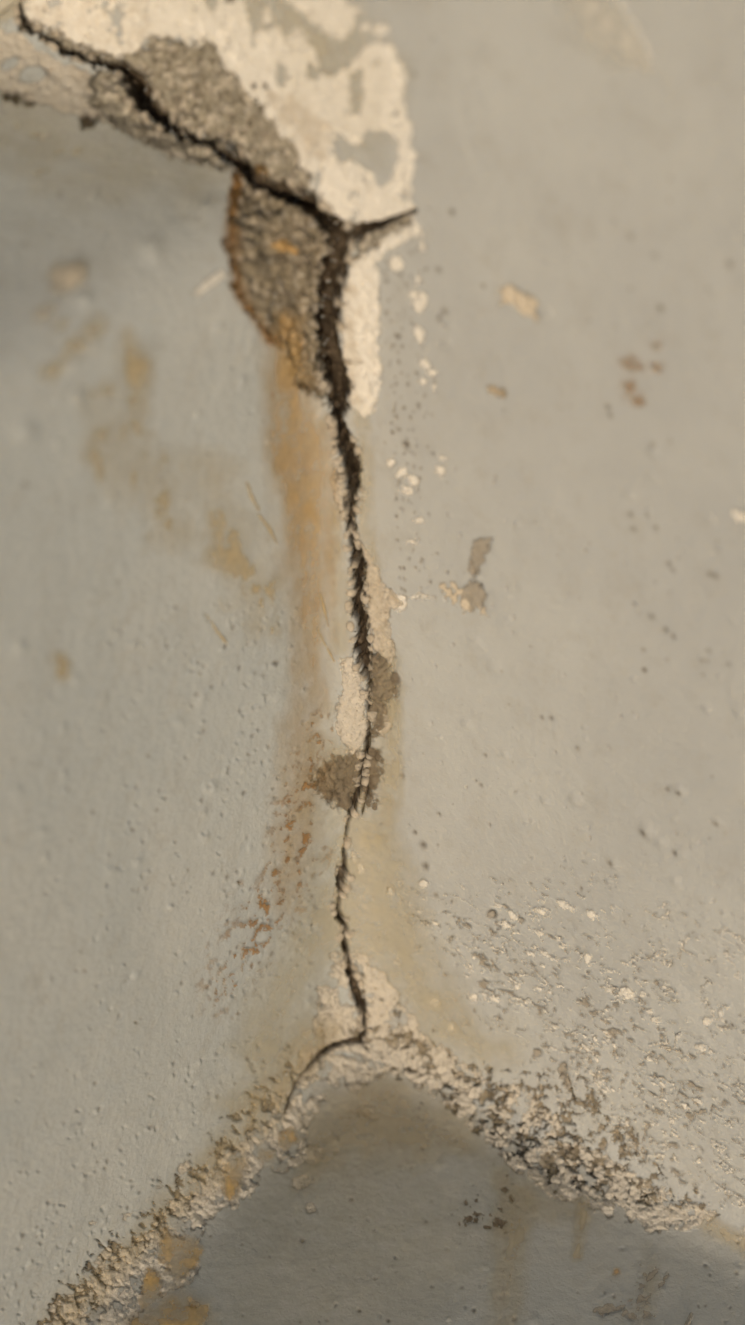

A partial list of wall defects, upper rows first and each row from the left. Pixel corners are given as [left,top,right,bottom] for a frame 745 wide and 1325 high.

peeling [0,0,437,419]
crack [13,0,417,1113]
peeling [387,459,419,495]
peeling [37,878,745,1325]